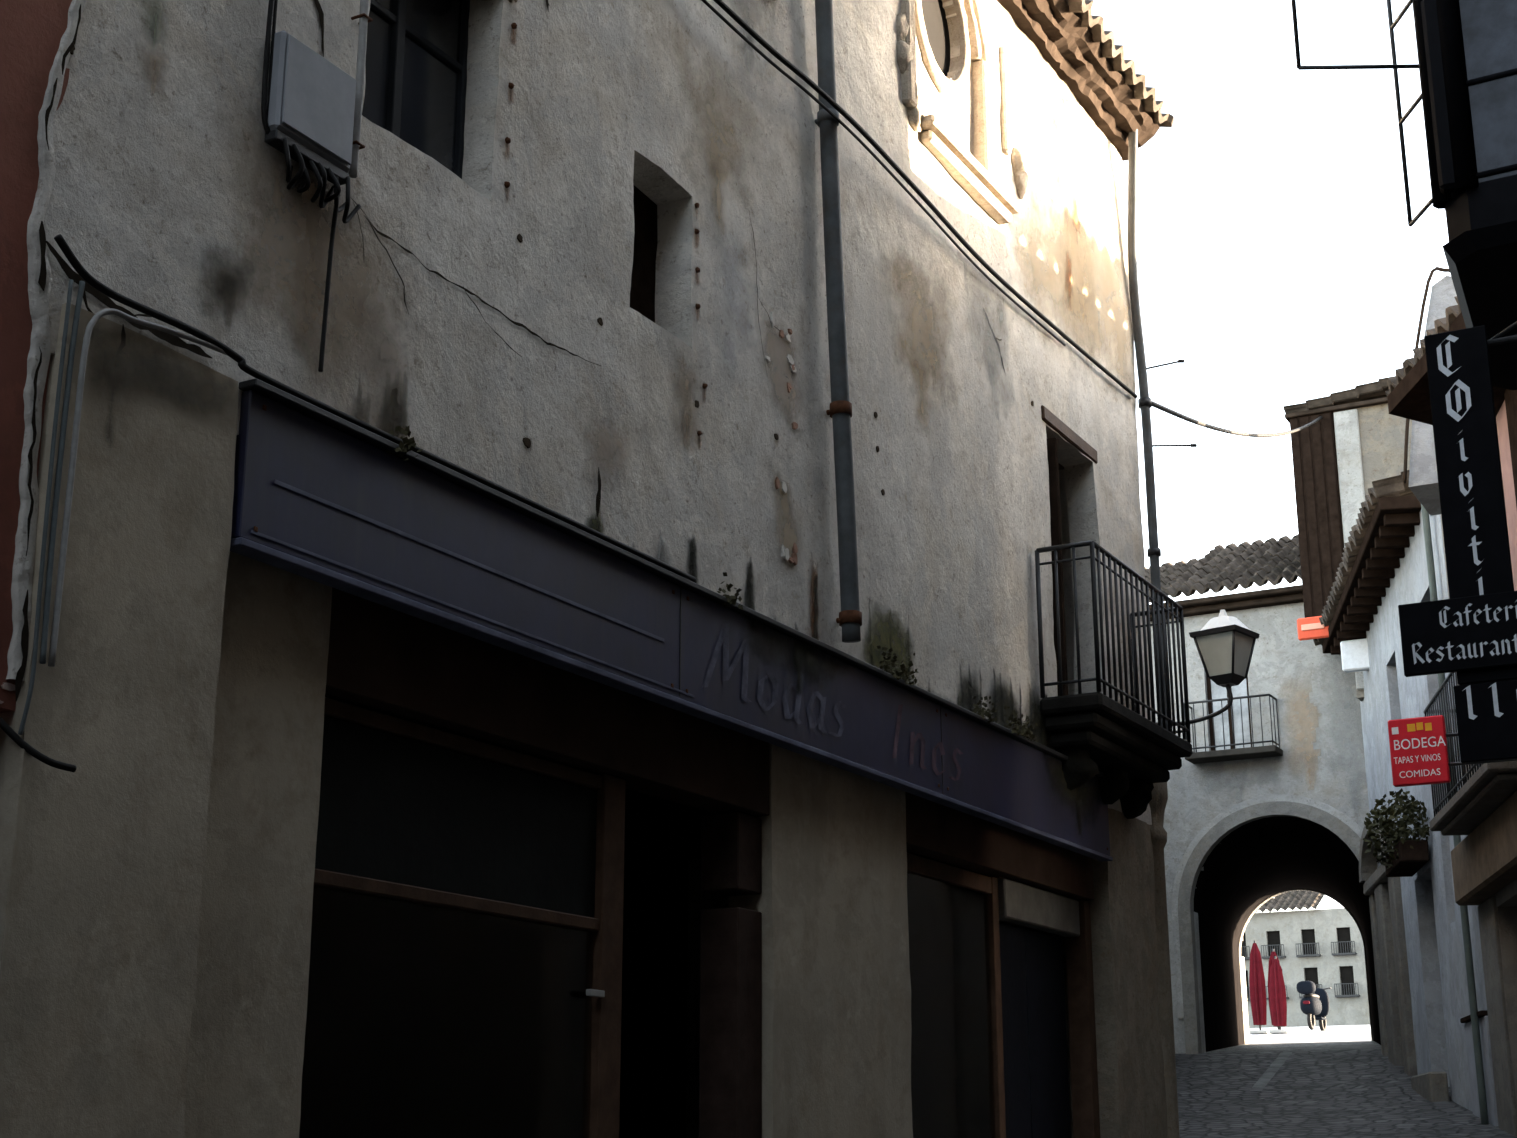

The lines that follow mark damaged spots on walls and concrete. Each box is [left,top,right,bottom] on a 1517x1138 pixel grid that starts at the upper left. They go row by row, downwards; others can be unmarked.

damp [210,262,243,324]
damp [250,175,372,345]
crack [345,191,601,366]
damp [588,467,604,533]
damp [688,539,698,584]
damp [745,563,755,610]
damp [958,668,1055,750]